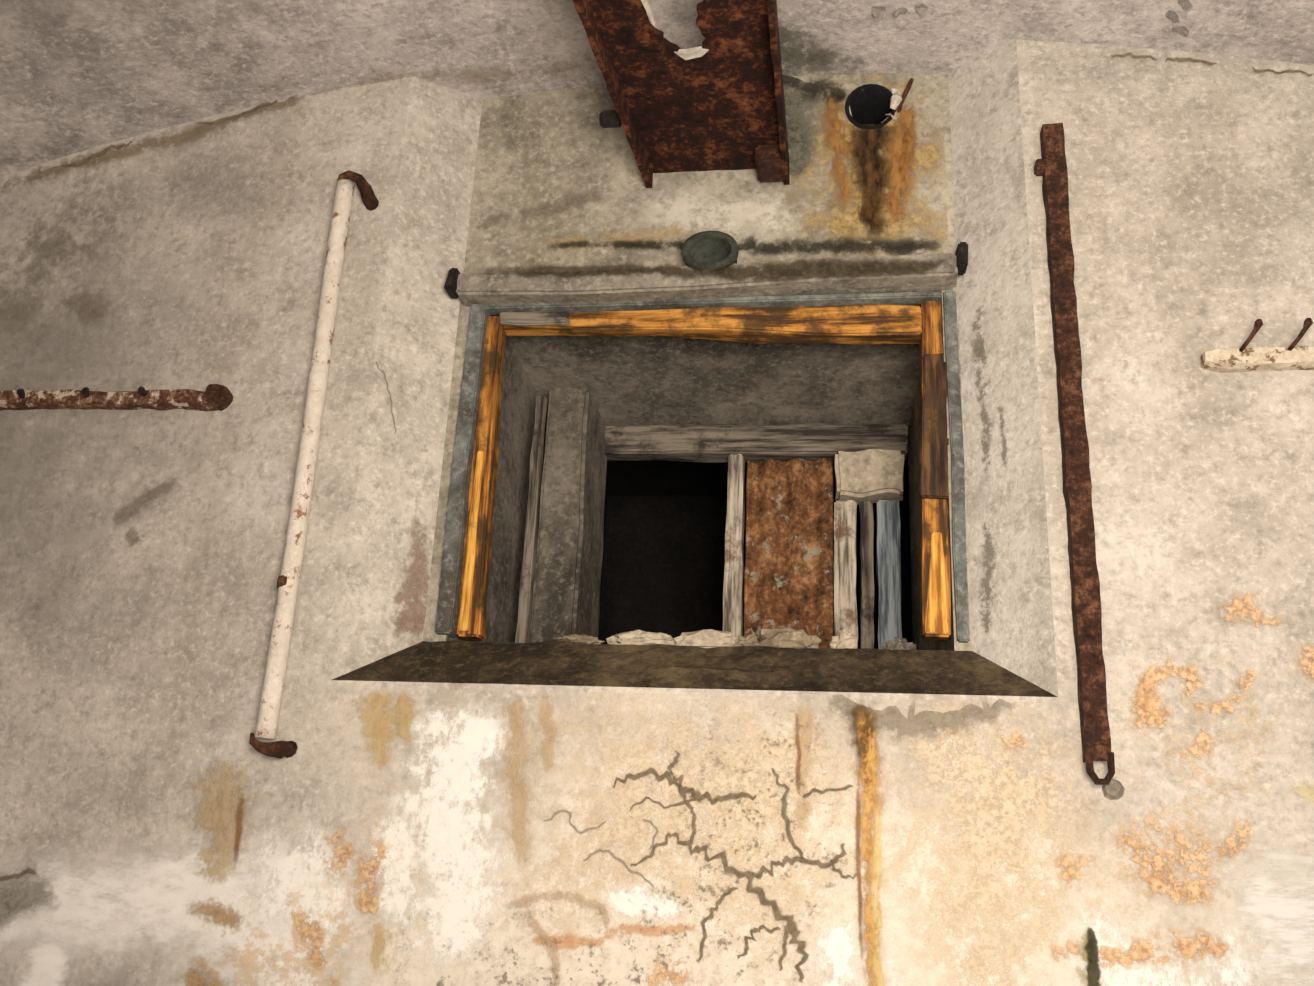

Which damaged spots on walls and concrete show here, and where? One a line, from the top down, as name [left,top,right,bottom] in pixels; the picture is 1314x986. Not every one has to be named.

corrosion [803,85,946,241]
leakage [485,226,945,281]
corrosion [200,765,243,880]
crack [544,751,857,982]
corrosion [852,705,884,986]
peeling [0,868,51,926]
corrosion [192,904,239,927]
corrosion [534,924,692,948]
corrosion [647,960,689,986]